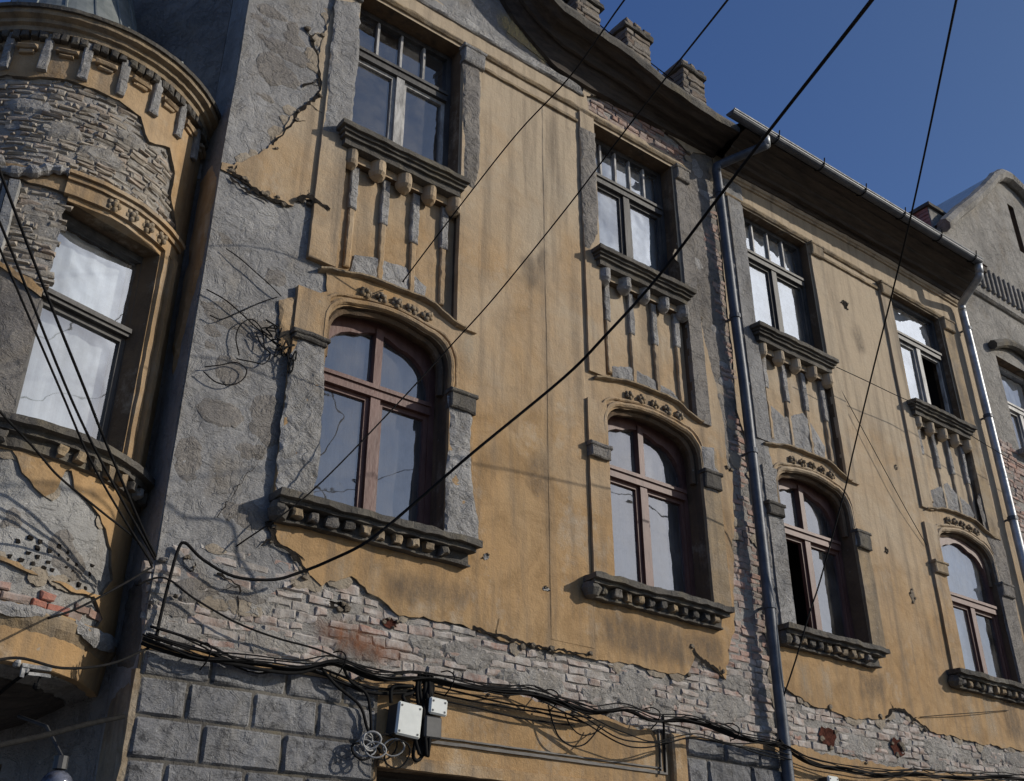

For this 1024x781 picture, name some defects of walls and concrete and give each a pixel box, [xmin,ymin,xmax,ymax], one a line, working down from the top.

crack [272,25,323,150]
flaking render [582,94,691,165]
flaking render [0,535,101,626]
flaking render [140,412,1024,781]